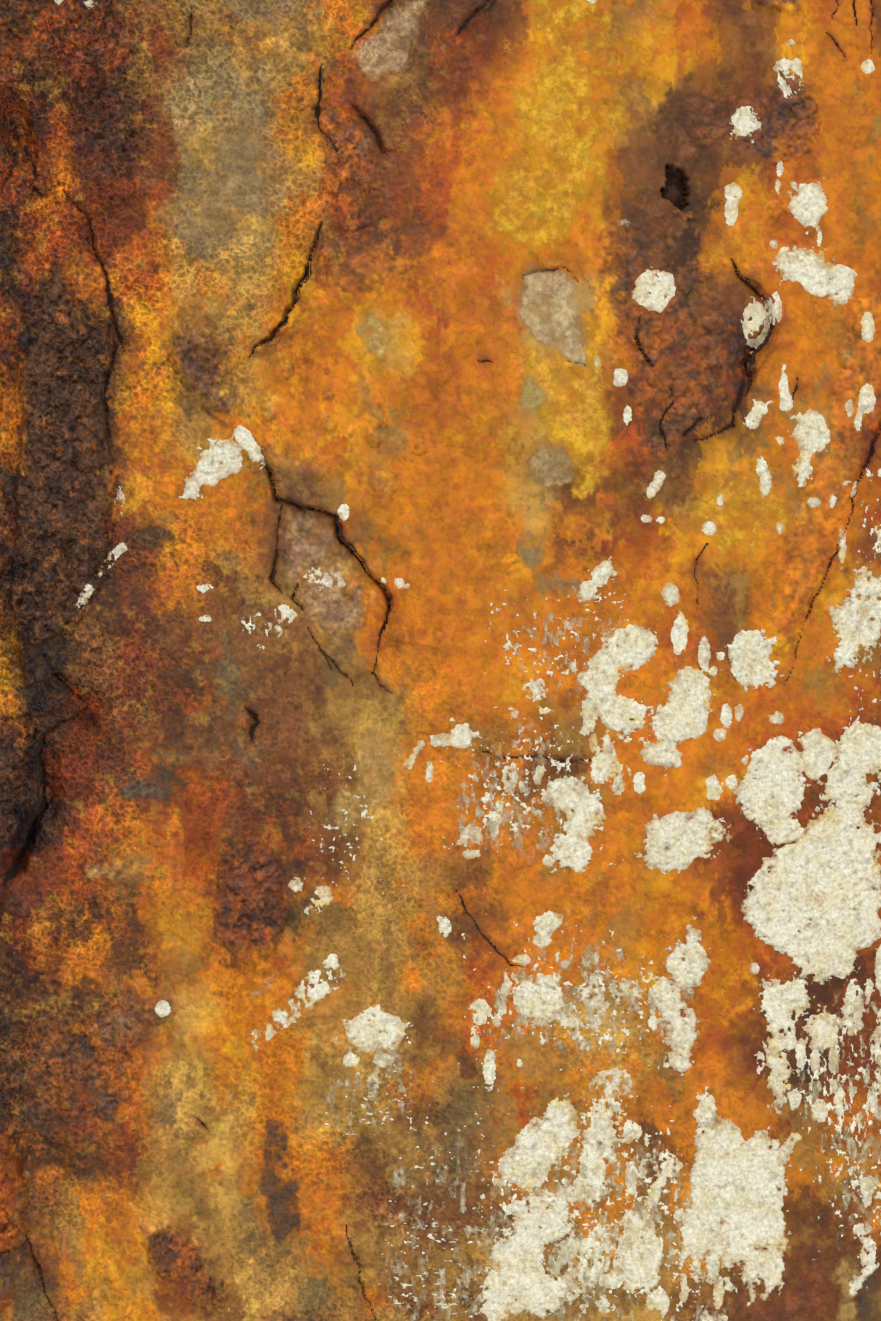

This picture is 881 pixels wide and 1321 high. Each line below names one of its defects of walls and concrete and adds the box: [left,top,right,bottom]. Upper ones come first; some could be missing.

corrosion [485,0,623,252]
crack [1,145,125,438]
corrosion [8,264,173,648]
crack [249,221,324,357]
crack [264,460,400,693]
corrosion [524,321,612,499]
crack [694,543,709,605]
crack [634,259,780,451]
crack [783,428,881,684]
corrosion [709,818,783,1027]
corrosion [226,950,302,1245]
corrosion [135,1219,228,1316]